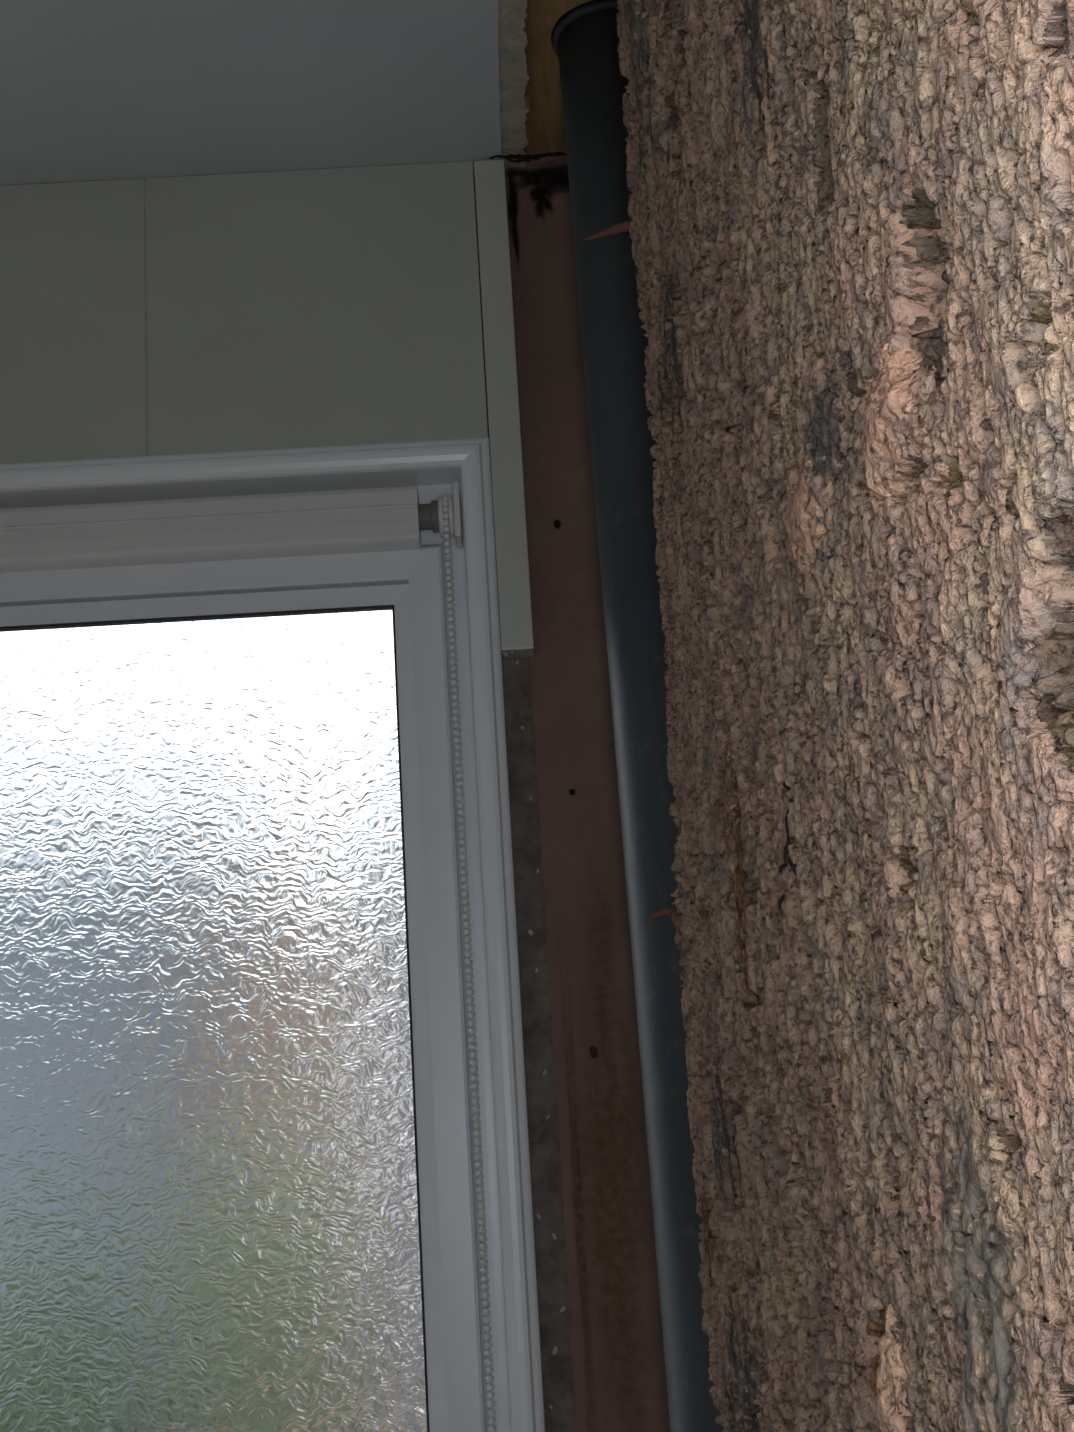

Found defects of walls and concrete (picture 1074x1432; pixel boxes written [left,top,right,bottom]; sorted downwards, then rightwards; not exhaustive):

crack [777,781,797,910]